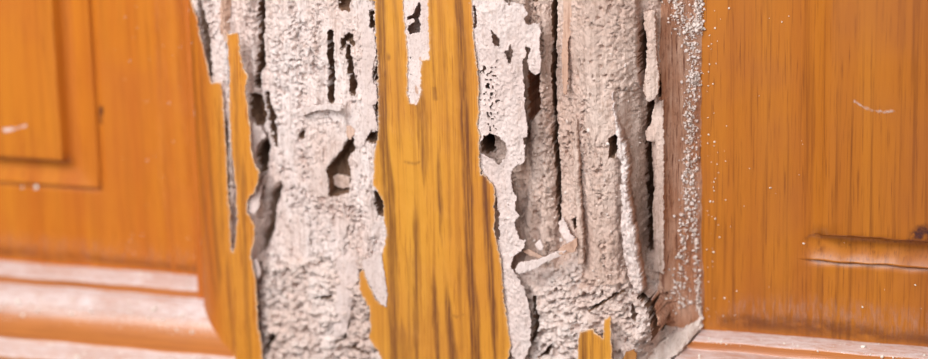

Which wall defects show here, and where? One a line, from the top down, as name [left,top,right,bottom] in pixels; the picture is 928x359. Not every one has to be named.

peeling [299,103,345,116]
peeling [251,123,266,154]
peeling [333,173,351,189]
peeling [248,178,266,215]
peeling [558,217,576,243]